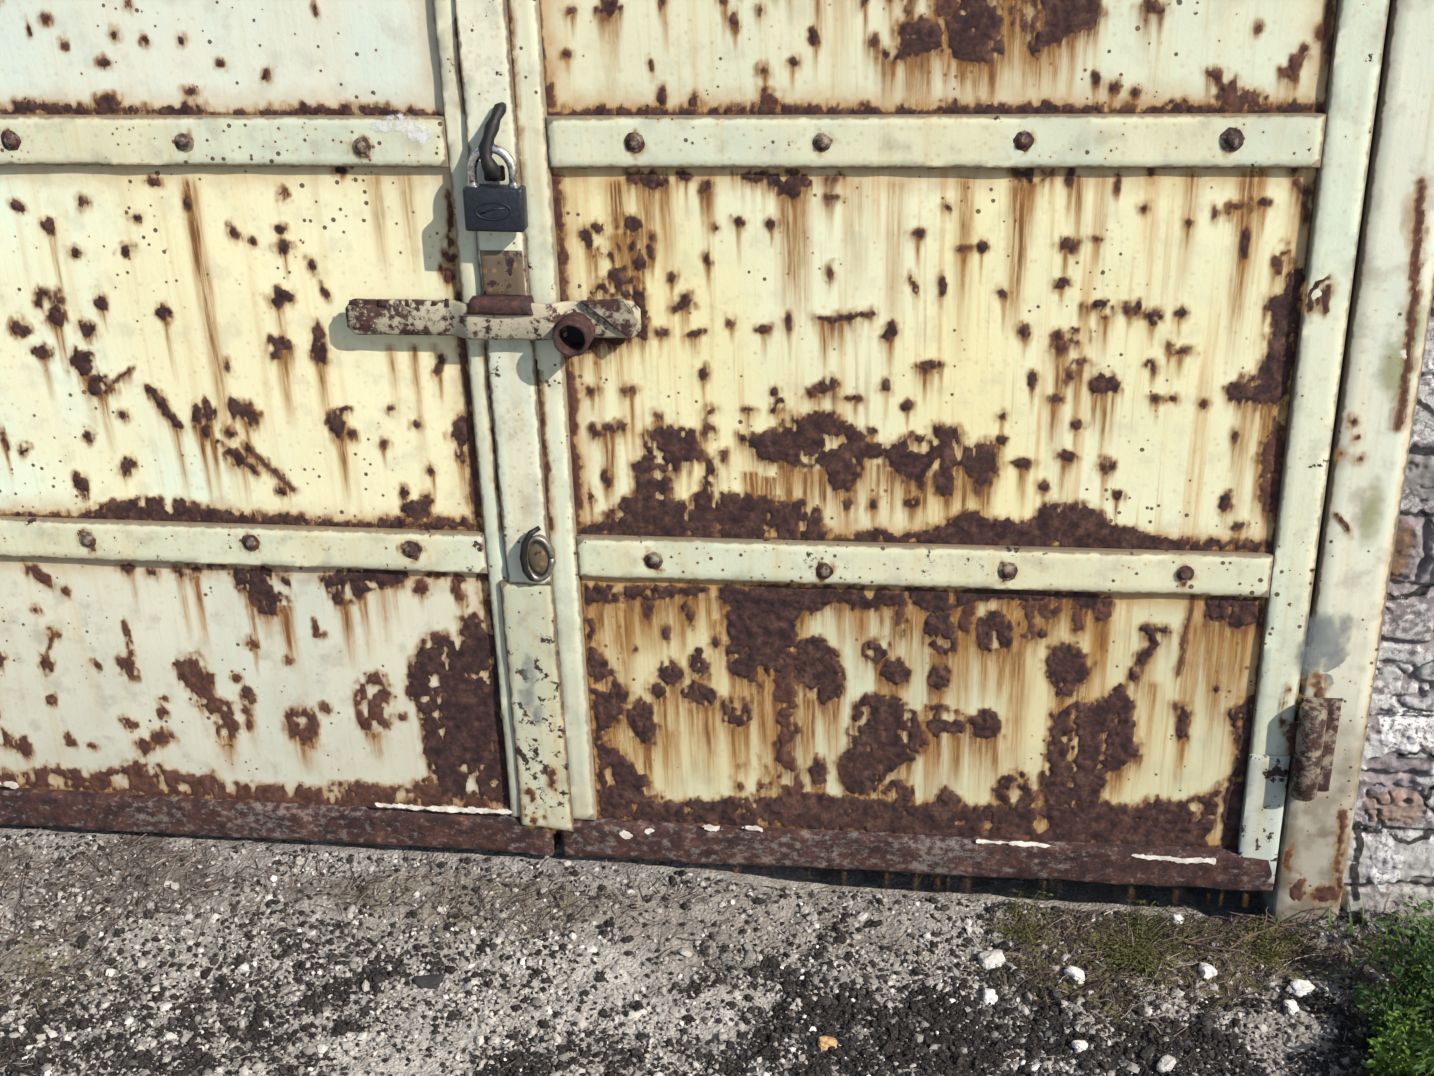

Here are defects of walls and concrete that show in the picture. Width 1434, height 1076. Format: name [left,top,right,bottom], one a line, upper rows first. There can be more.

corrosion [93,93,122,114]
corrosion [868,0,1108,92]
corrosion [144,179,297,494]
corrosion [266,284,353,484]
corrosion [399,483,435,522]
corrosion [438,189,462,302]
corrosion [450,336,483,521]
corrosion [551,169,1305,849]
corrosion [1288,168,1316,229]
corrosion [1393,177,1428,432]
corrosion [0,540,557,826]
corrosion [1279,673,1327,757]